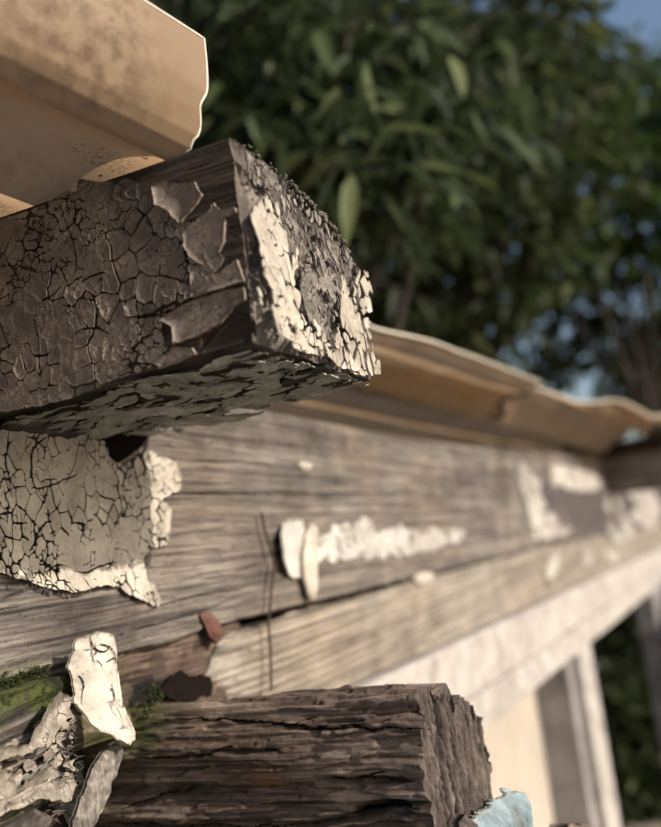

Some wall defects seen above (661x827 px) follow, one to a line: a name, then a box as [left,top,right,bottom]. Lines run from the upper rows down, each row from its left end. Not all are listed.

crack [0,178,243,412]
peeling [0,144,381,607]
peeling [318,516,466,563]
peeling [411,572,434,585]
crack [182,717,427,732]
peeling [0,702,84,797]
crack [139,745,285,759]
crack [104,788,193,826]
crack [189,771,417,827]